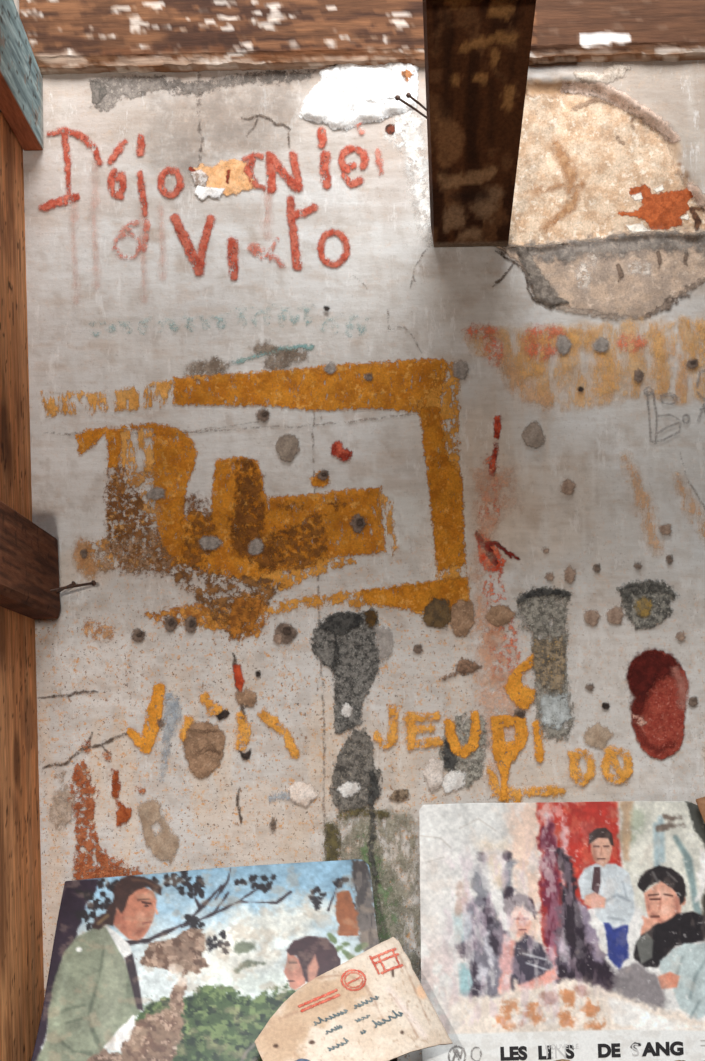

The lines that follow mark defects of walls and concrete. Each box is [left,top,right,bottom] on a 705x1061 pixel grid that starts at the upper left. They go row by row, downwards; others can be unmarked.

flaking render [496,63,705,321]